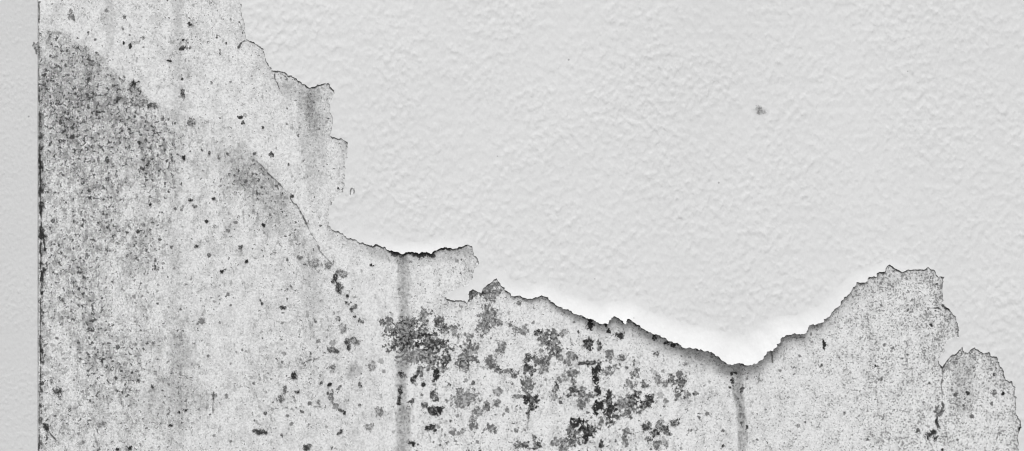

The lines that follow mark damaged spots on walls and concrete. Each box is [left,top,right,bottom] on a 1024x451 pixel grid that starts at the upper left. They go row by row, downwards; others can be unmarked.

damp [116,76,157,108]
damp [379,282,699,451]